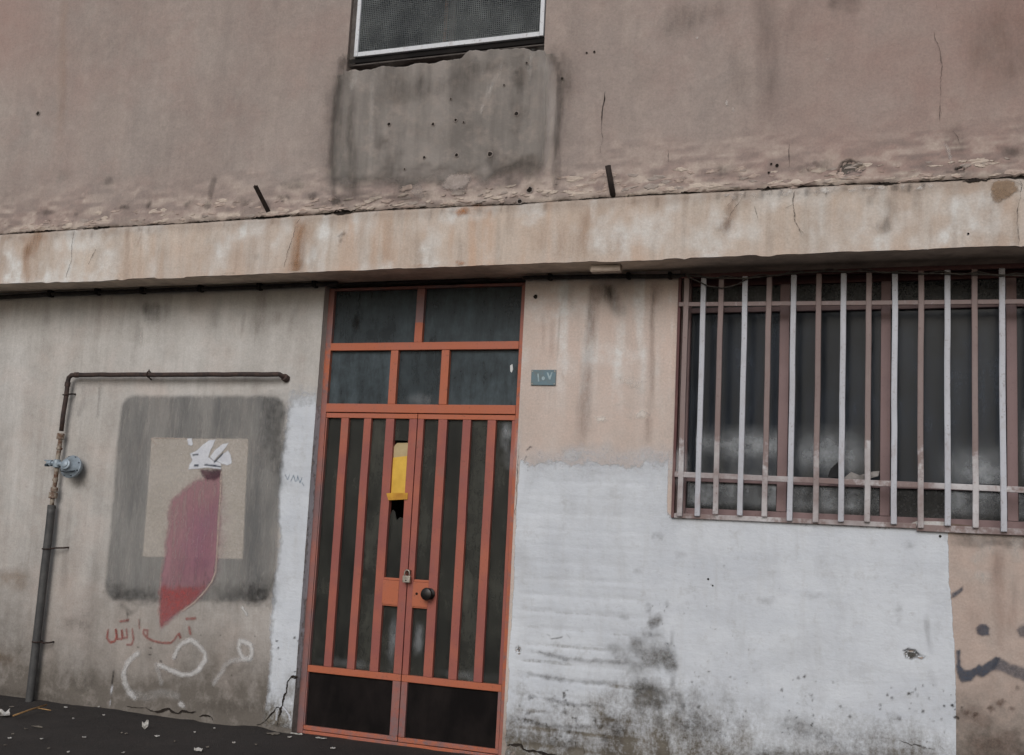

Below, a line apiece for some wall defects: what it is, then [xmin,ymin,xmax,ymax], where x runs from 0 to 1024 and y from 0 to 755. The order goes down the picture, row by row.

peeling [131,157,1024,224]
peeling [1,210,120,234]
leakage [634,686,662,709]